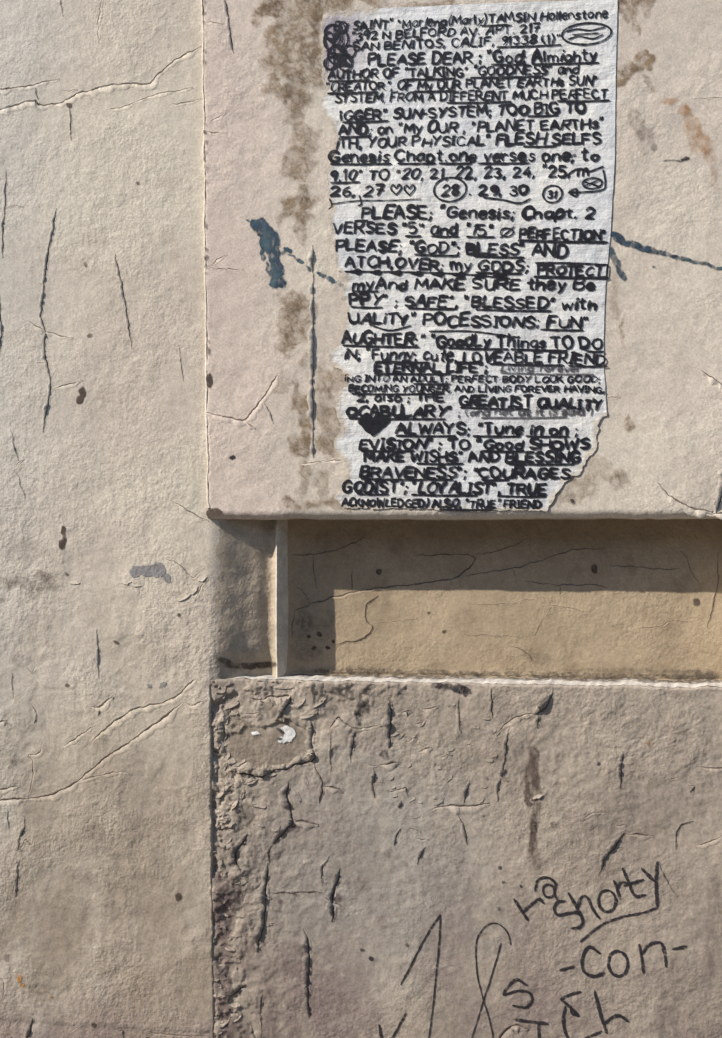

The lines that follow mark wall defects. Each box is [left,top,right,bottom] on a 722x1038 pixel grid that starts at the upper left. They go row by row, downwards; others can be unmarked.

crack [0,171,23,258]
crack [0,208,83,432]
crack [114,253,132,348]
water stain [287,254,336,283]
crack [205,375,279,430]
crack [656,468,722,520]
crack [290,537,720,661]
peeling [212,684,327,850]
crack [0,629,554,953]
water stain [524,748,539,850]
peeling [211,860,247,1038]
crack [300,929,316,1018]